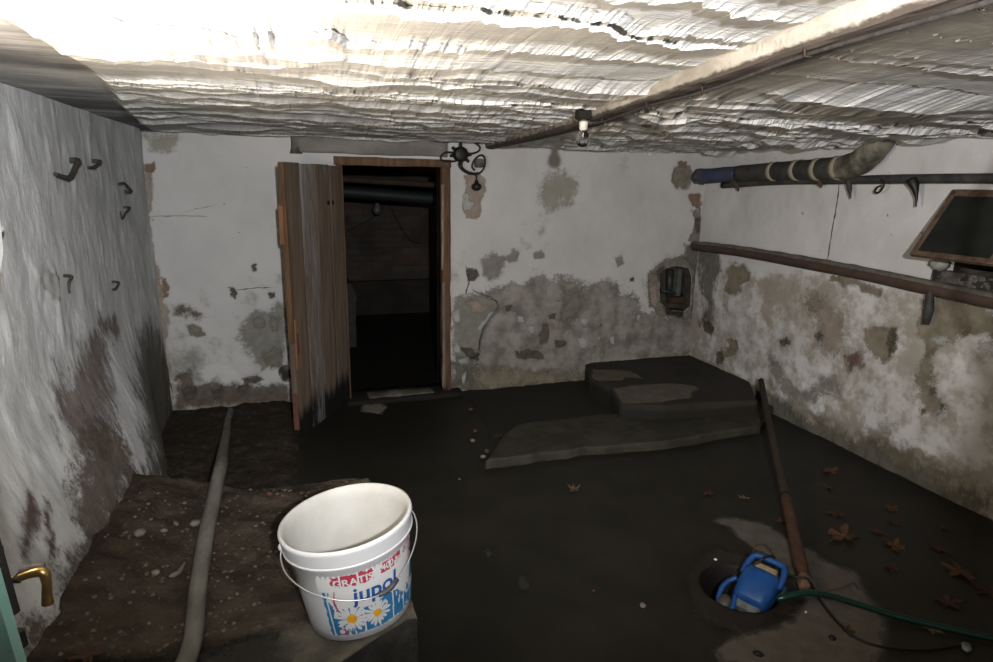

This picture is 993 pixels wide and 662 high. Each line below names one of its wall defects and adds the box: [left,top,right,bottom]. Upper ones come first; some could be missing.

peeling [462,172,486,219]
damp [542,173,578,210]
flaking render [671,161,702,242]
flaking render [466,268,479,281]
flaking render [647,255,695,320]
flaking render [724,262,750,295]
flaking render [155,263,291,410]
damp [238,305,290,370]
flaking render [844,326,898,371]
damp [132,315,173,474]
damp [50,312,138,594]
damp [757,354,988,518]